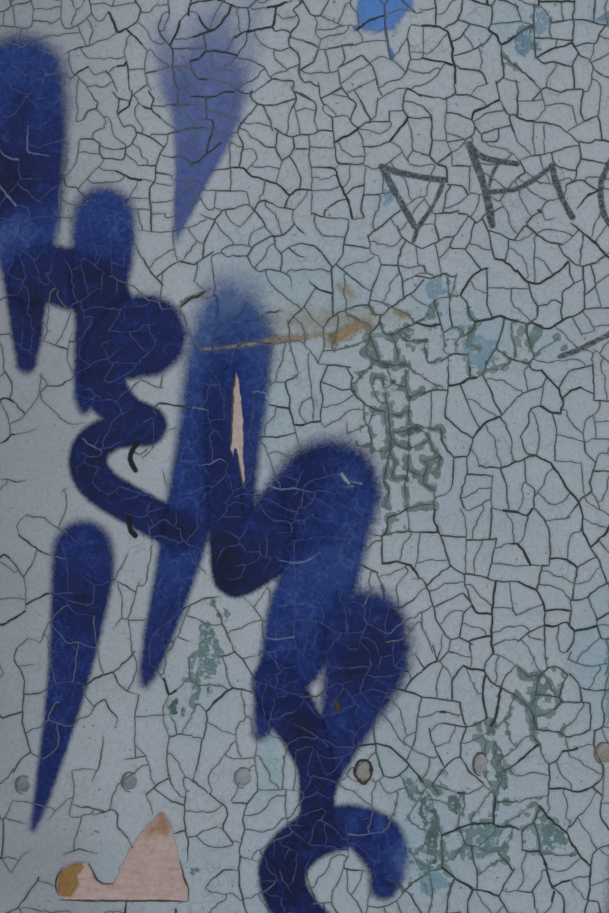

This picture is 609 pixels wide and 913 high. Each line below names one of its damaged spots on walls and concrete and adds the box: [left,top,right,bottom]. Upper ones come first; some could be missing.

rust [228,321,368,347]
crack [0,0,609,606]
peeling [230,372,245,490]
peeling [55,812,199,902]